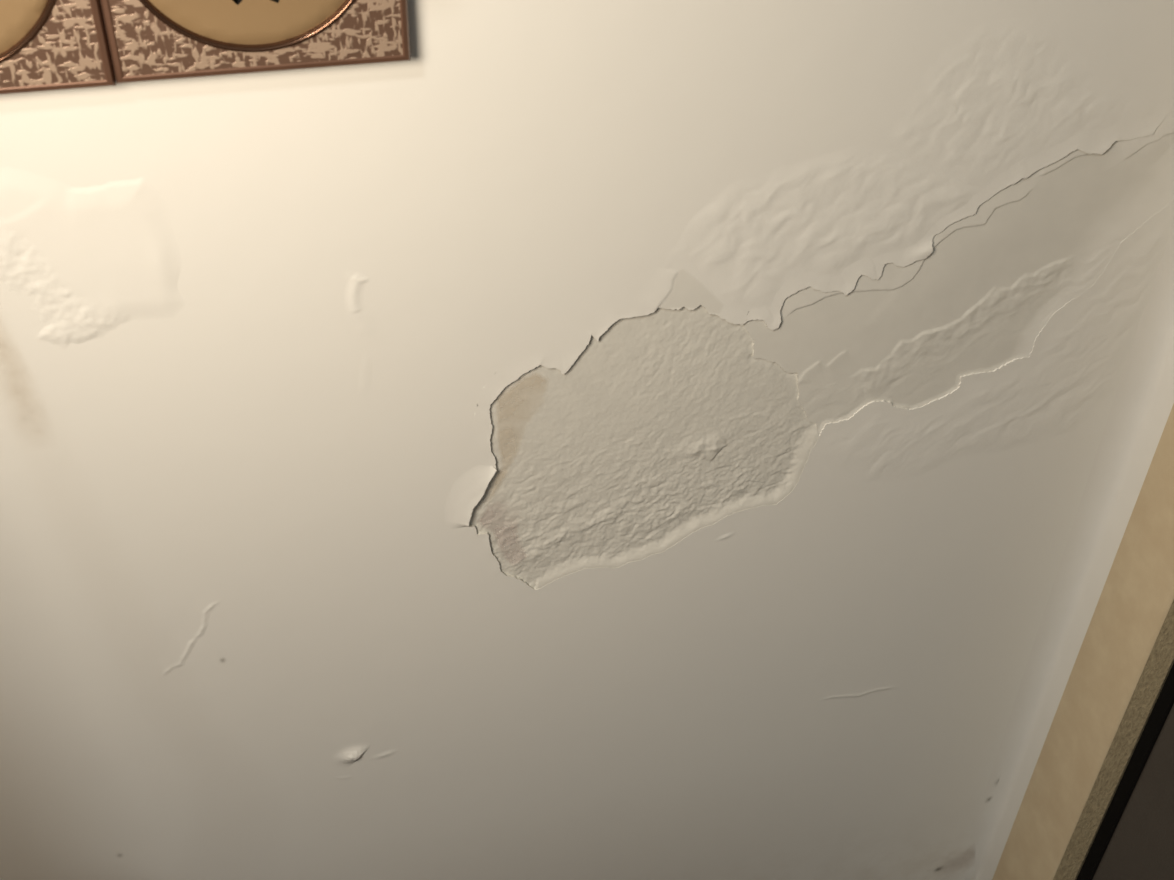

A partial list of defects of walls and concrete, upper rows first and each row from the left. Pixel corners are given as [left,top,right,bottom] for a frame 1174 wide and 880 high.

peeling [444,100,1174,593]